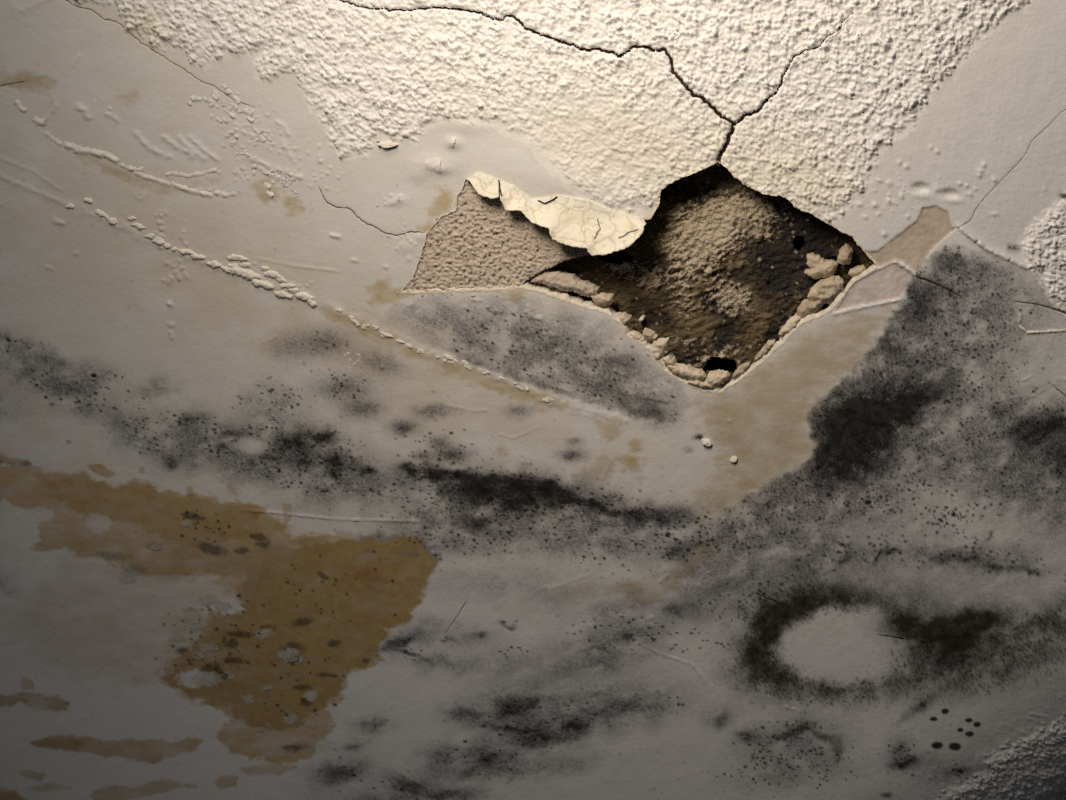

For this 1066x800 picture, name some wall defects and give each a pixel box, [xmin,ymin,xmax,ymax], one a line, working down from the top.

crack [66,0,254,107]
crack [339,0,852,166]
spalling [396,160,954,394]
damp [0,246,1066,773]
damp [733,720,853,788]